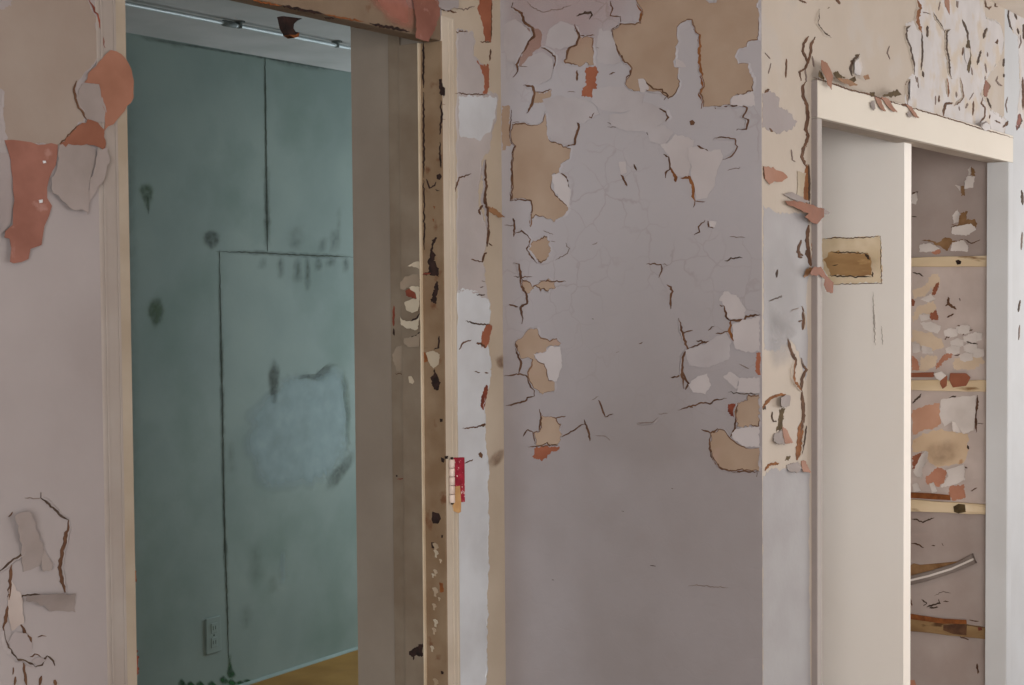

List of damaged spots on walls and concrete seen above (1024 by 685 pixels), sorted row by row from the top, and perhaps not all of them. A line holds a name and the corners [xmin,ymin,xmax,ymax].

peeling [0,0,107,233]
peeling [545,21,599,98]
crack [503,1,644,128]
peeling [611,0,761,109]
peeling [837,0,1024,133]
leakage [206,57,352,667]
peeling [452,0,580,685]
crack [509,231,597,324]
peeling [755,166,883,380]
peeling [911,394,983,449]
peeling [911,272,985,381]
peeling [701,393,811,685]